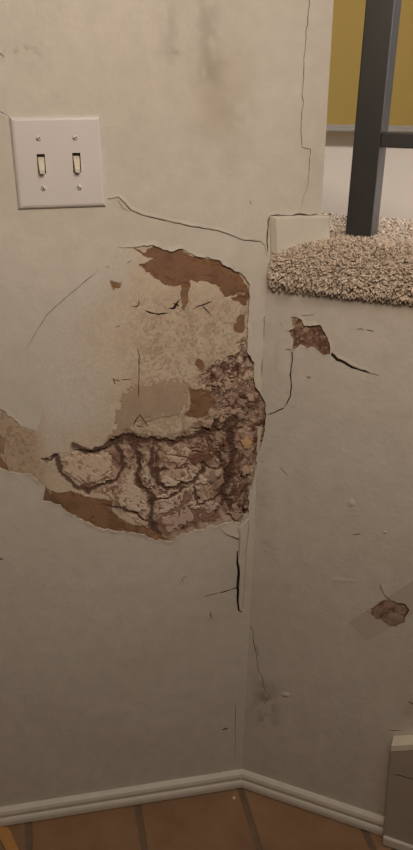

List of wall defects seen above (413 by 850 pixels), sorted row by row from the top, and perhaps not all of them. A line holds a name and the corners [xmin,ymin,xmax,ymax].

crack [107,0,316,257]
flaking render [0,240,379,612]
peeling [366,585,409,626]